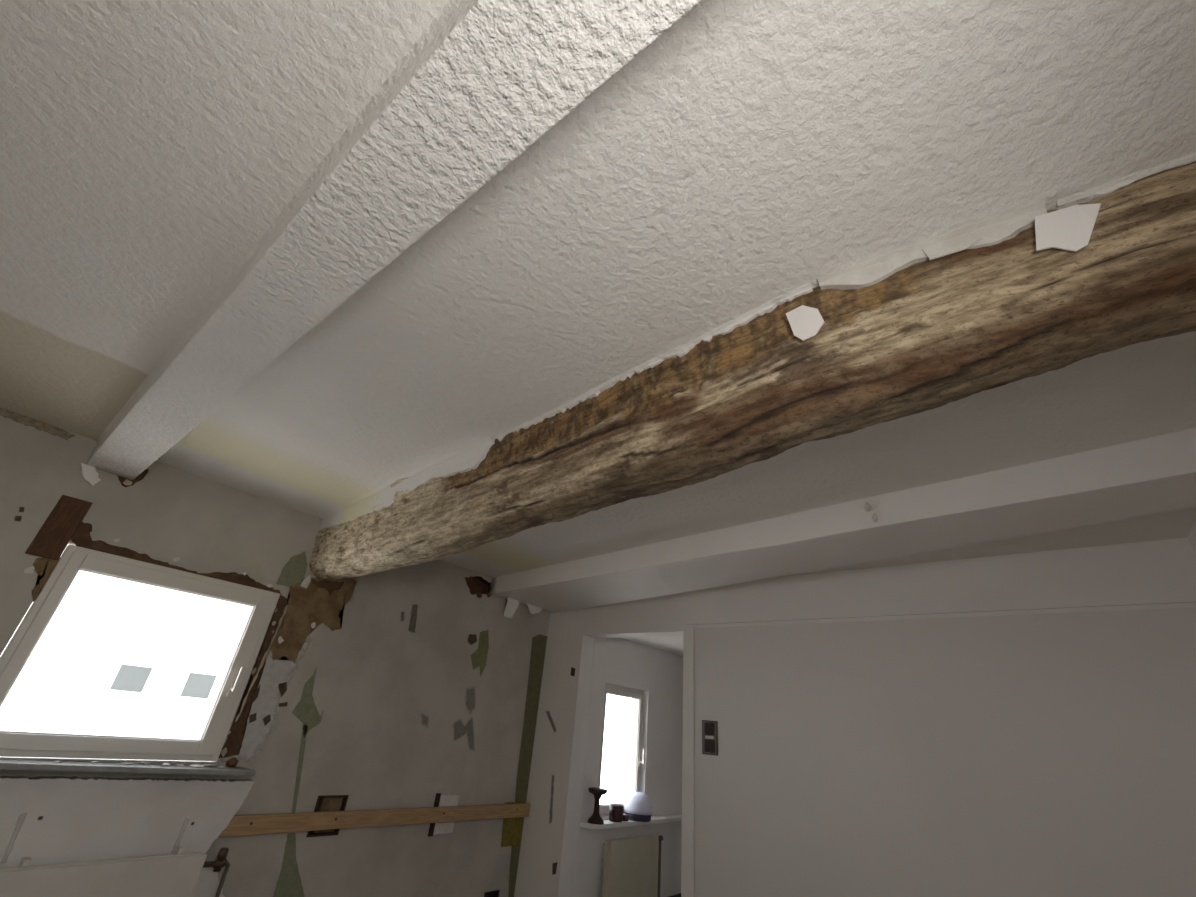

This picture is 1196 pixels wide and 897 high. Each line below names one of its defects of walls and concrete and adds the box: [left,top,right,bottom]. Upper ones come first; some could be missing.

spalling [319,153,1196,530]
peeling [24,557,61,602]
spalling [465,577,491,598]
spalling [504,597,542,618]
peeling [71,532,357,758]